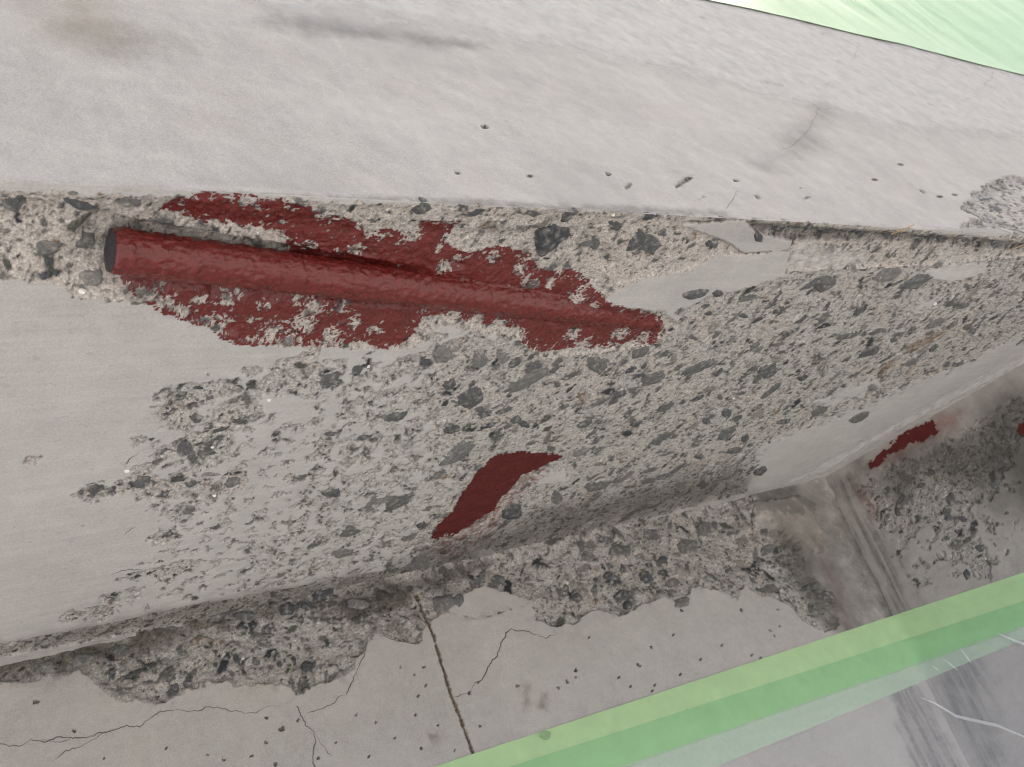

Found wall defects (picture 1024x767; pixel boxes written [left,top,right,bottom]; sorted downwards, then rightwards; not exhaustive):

spalling [0,176,1024,704]
crack [0,636,422,767]
crack [455,628,555,697]